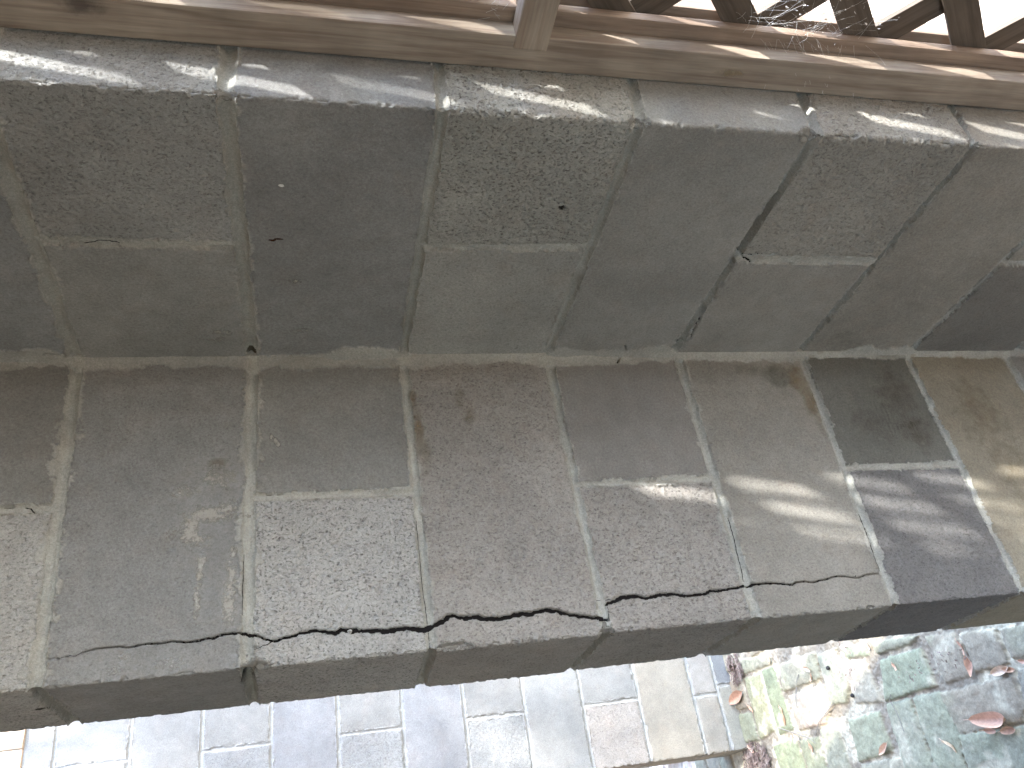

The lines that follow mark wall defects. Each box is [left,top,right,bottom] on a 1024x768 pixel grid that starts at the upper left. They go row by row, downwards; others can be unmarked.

crack [116,516,879,650]